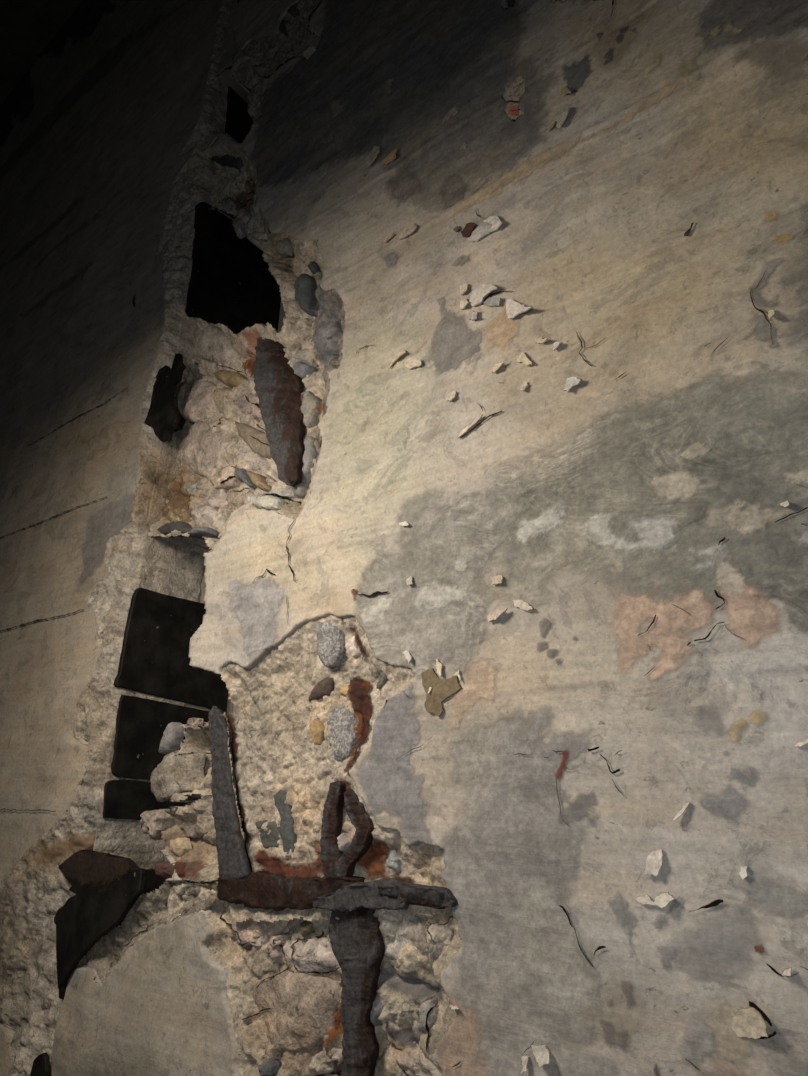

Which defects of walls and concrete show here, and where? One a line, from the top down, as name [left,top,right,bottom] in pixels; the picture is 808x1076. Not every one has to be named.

damp [251,0,652,213]
damp [591,0,808,136]
peeling [453,215,503,243]
damp [428,298,519,372]
spalling [0,0,346,1076]
crack [252,520,297,621]
spalling [220,615,462,888]
corrosion [555,750,568,778]
damp [357,372,808,1076]
spalling [370,904,463,1076]
crack [559,905,606,967]
crack [749,1001,777,1040]